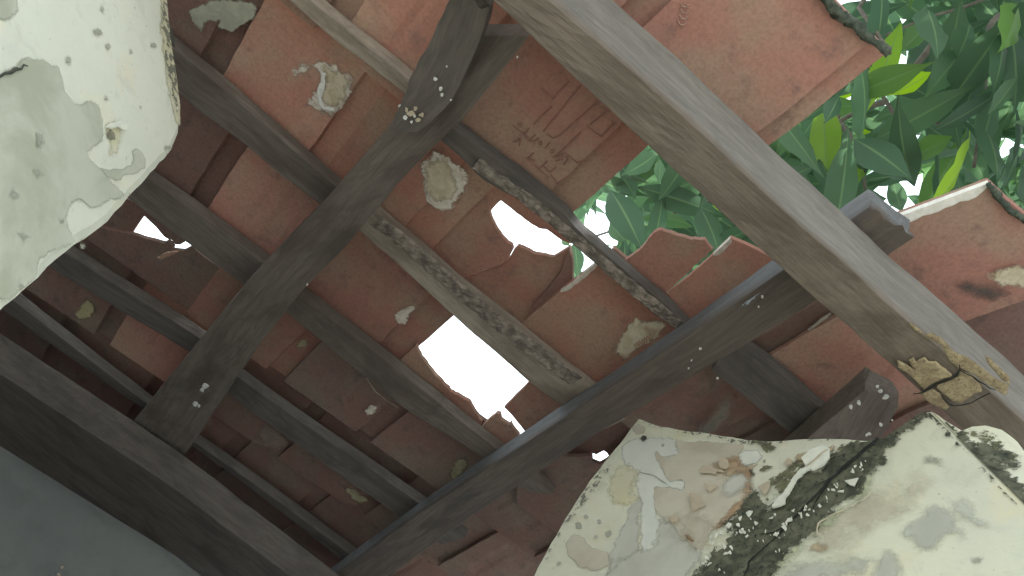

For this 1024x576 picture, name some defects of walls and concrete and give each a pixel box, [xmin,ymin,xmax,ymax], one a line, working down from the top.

spalling [106,121,128,153]
peeling [101,149,146,180]
peeling [654,440,750,550]
water stain [576,411,1024,576]
crack [743,437,880,576]